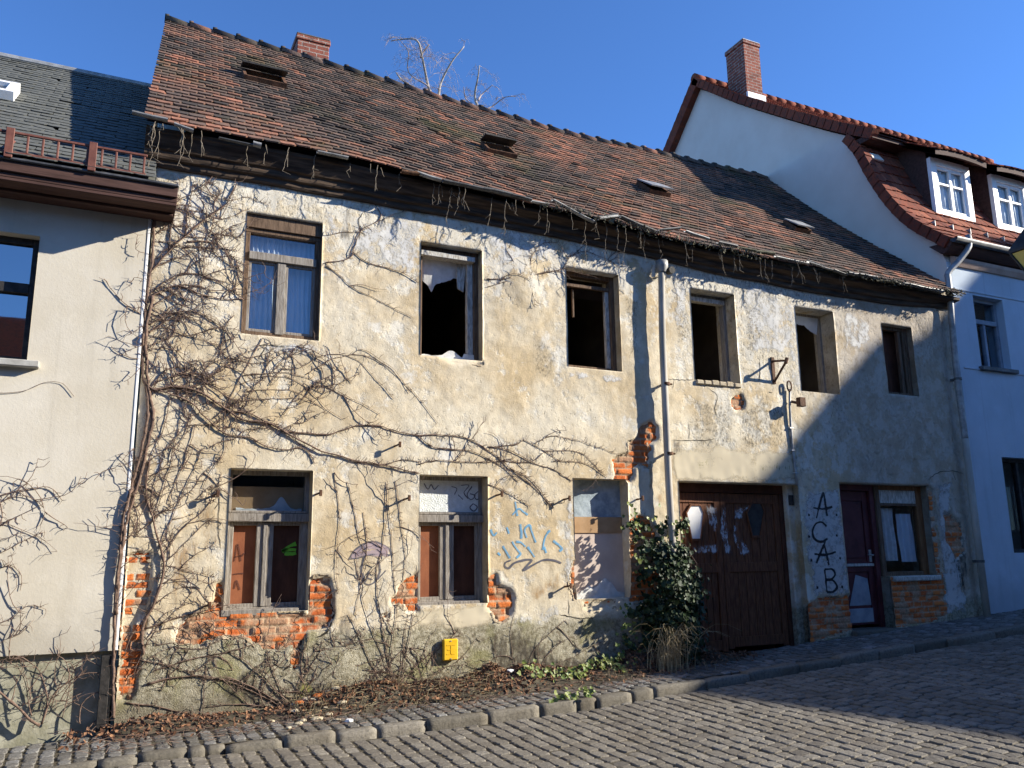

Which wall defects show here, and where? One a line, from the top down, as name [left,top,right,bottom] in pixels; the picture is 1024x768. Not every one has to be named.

spalling [731,395,744,411]
spalling [612,422,656,482]
spalling [115,550,152,700]
spalling [175,574,336,668]
spalling [379,575,418,625]
spalling [487,574,558,624]
peeling [805,490,852,642]
spalling [890,483,966,627]